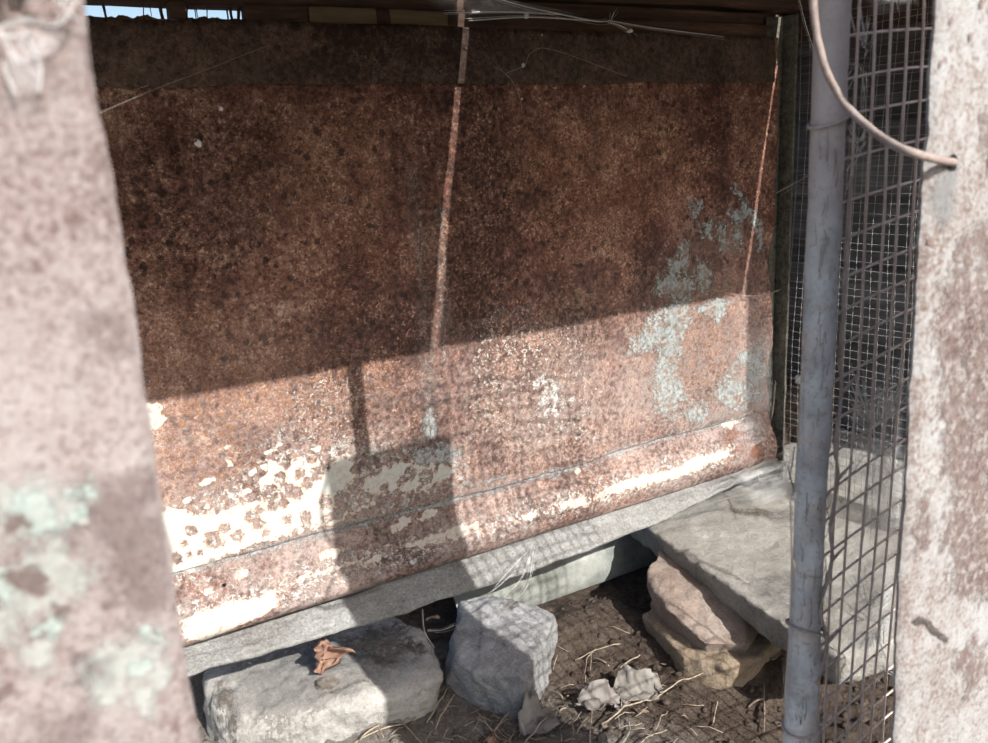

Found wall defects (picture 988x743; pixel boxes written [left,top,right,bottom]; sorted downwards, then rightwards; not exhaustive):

peeling [626,182,765,431]
peeling [147,402,168,431]
rust [142,316,388,442]
peeling [502,318,575,433]
rust [725,428,763,462]
peeling [163,408,739,647]
peeling [78,624,174,716]